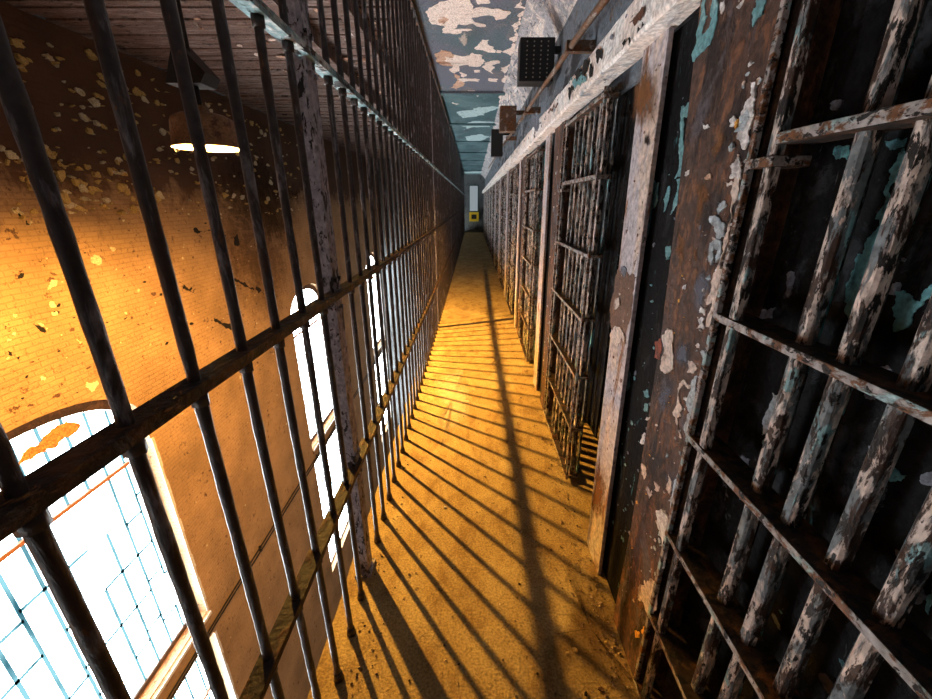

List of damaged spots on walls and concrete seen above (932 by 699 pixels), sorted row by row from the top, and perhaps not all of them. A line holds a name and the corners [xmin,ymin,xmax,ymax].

peeling [0,145,33,191]
peeling [9,38,33,82]
peeling [51,73,118,135]
peeling [44,144,142,222]
peeling [127,70,200,185]
peeling [153,187,203,215]
peeling [215,175,248,221]
peeling [245,119,303,214]
peeling [426,0,548,141]
peeling [677,61,763,332]
spalling [610,265,636,345]
peeling [622,328,704,613]